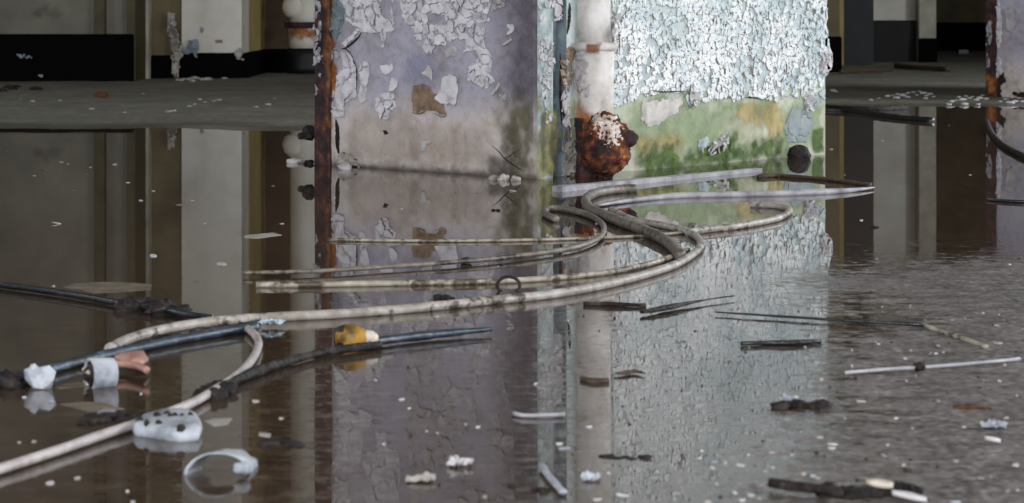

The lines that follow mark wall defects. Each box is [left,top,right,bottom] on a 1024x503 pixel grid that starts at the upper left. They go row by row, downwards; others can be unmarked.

peeling [167,12,204,78]
corrosion [290,0,337,102]
peeling [312,0,510,135]
peeling [611,0,833,144]
damp [726,103,784,139]